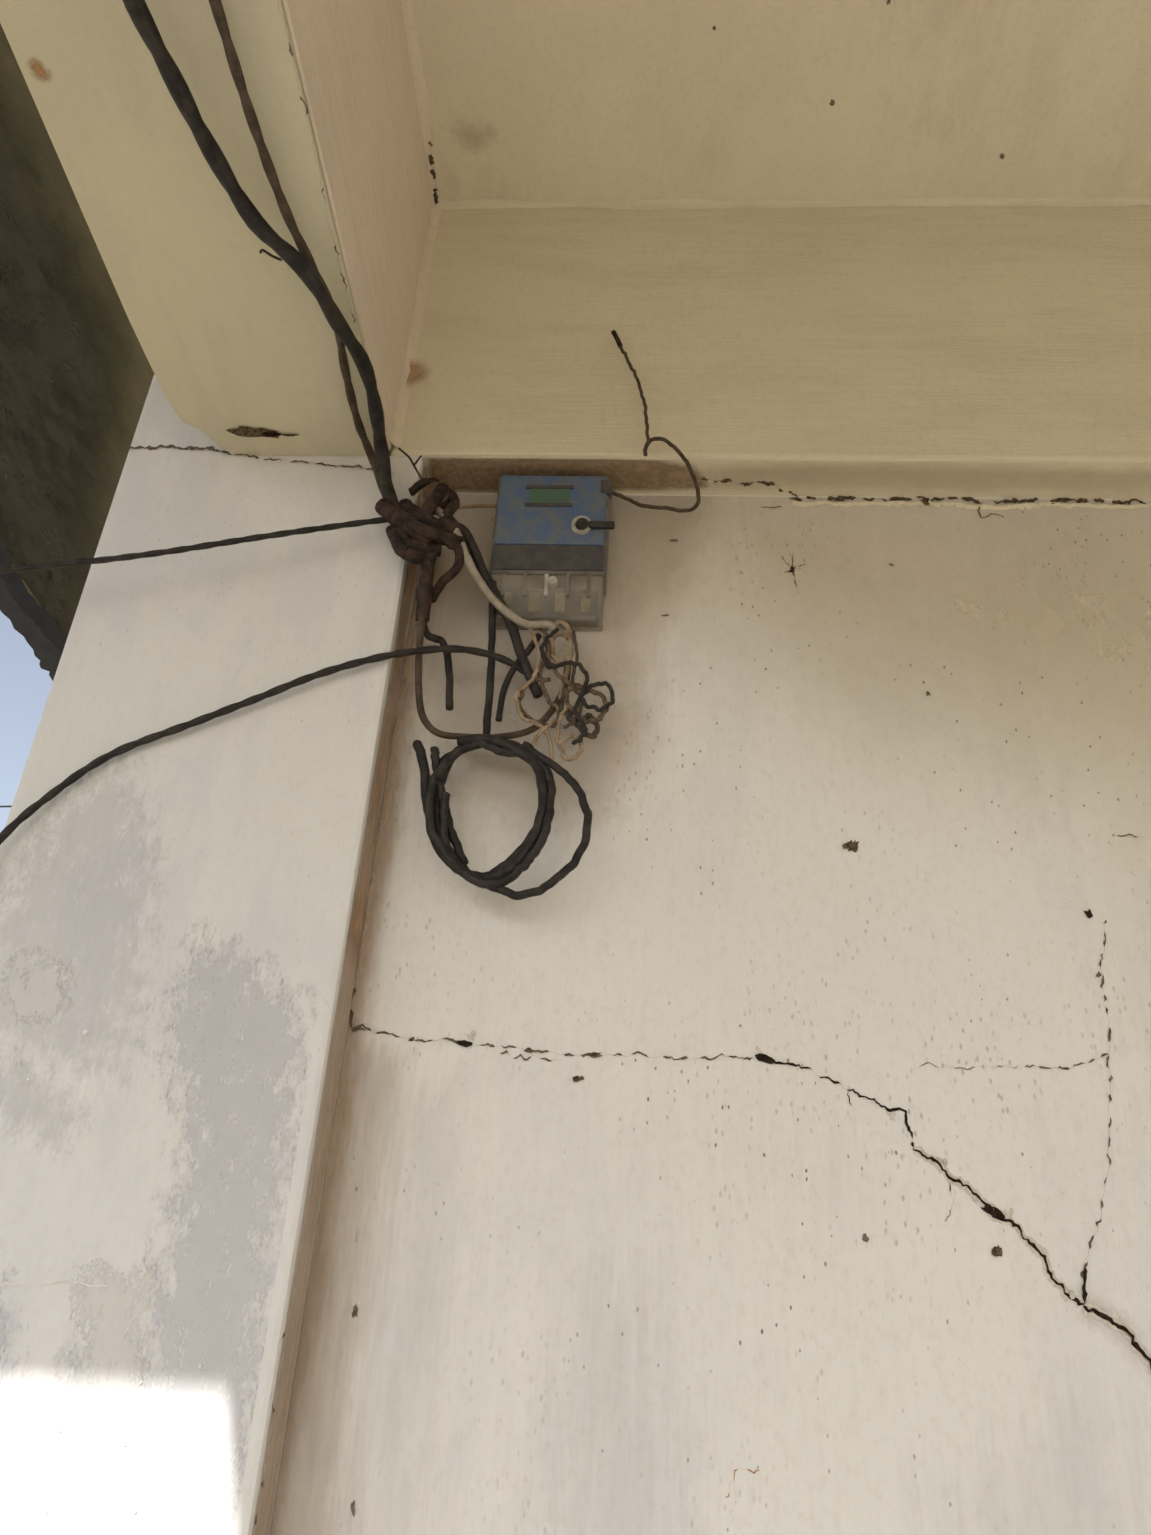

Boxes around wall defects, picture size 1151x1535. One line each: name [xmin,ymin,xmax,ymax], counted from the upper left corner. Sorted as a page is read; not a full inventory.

crack [701,477,1151,518]
crack [349,920,1151,1377]